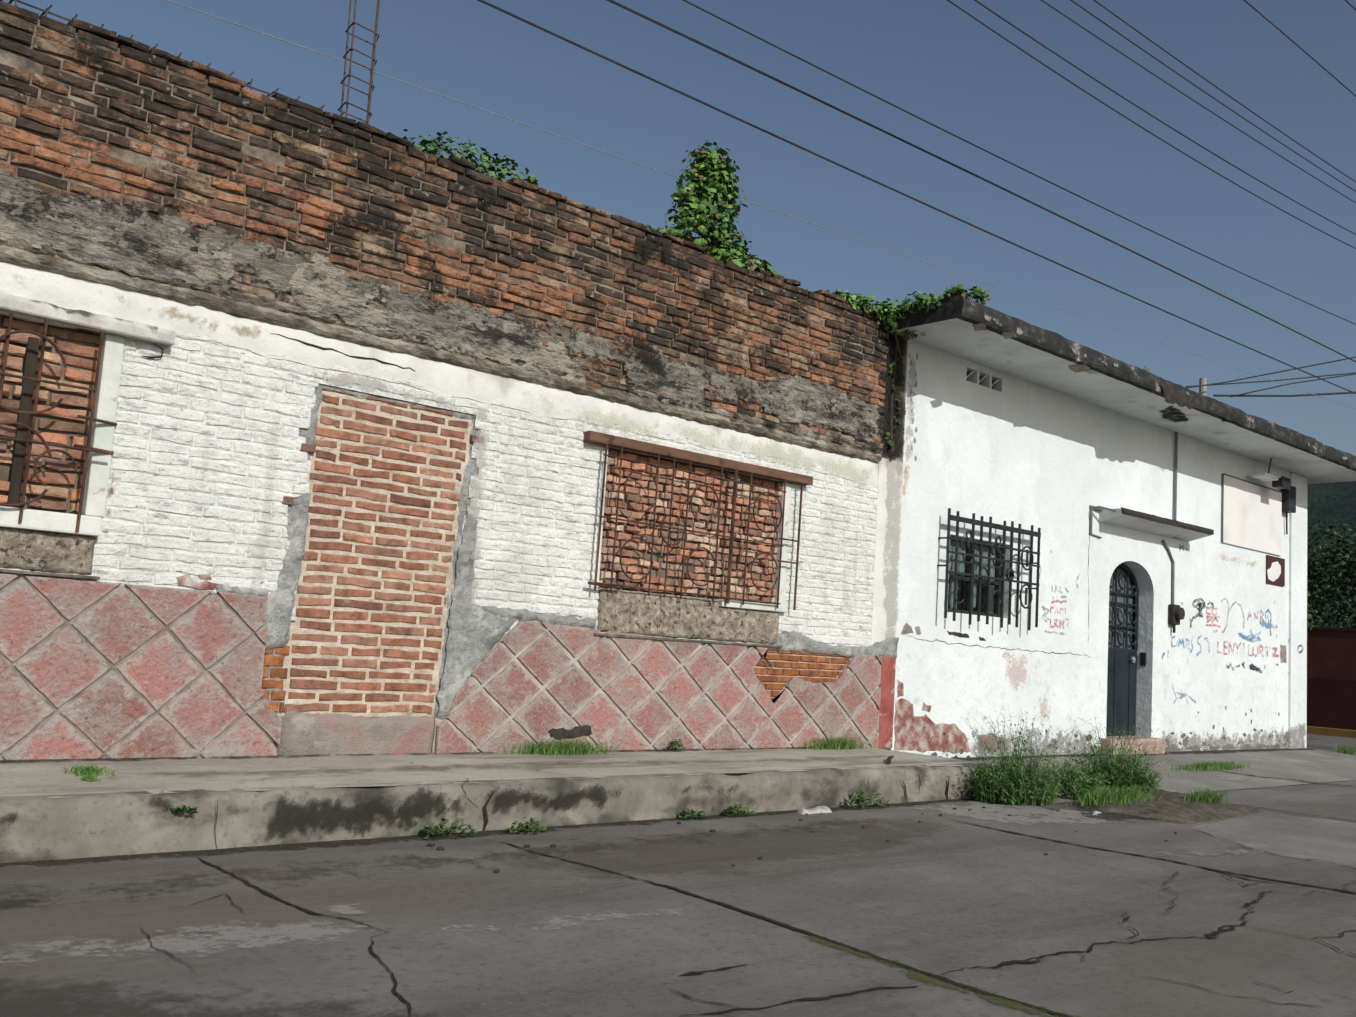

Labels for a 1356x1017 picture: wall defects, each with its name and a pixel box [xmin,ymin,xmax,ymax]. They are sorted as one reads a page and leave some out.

leakage [325,209,434,241]
crack [271,333,415,371]
flaking render [753,650,851,700]
peeling [894,679,1007,758]
leakage [972,730,1099,758]
leakage [1164,724,1306,752]
leakage [267,788,461,838]
leakage [488,783,621,813]
crack [1153,852,1356,955]
crack [141,928,192,967]
crack [369,932,411,1017]
crack [995,959,1041,968]